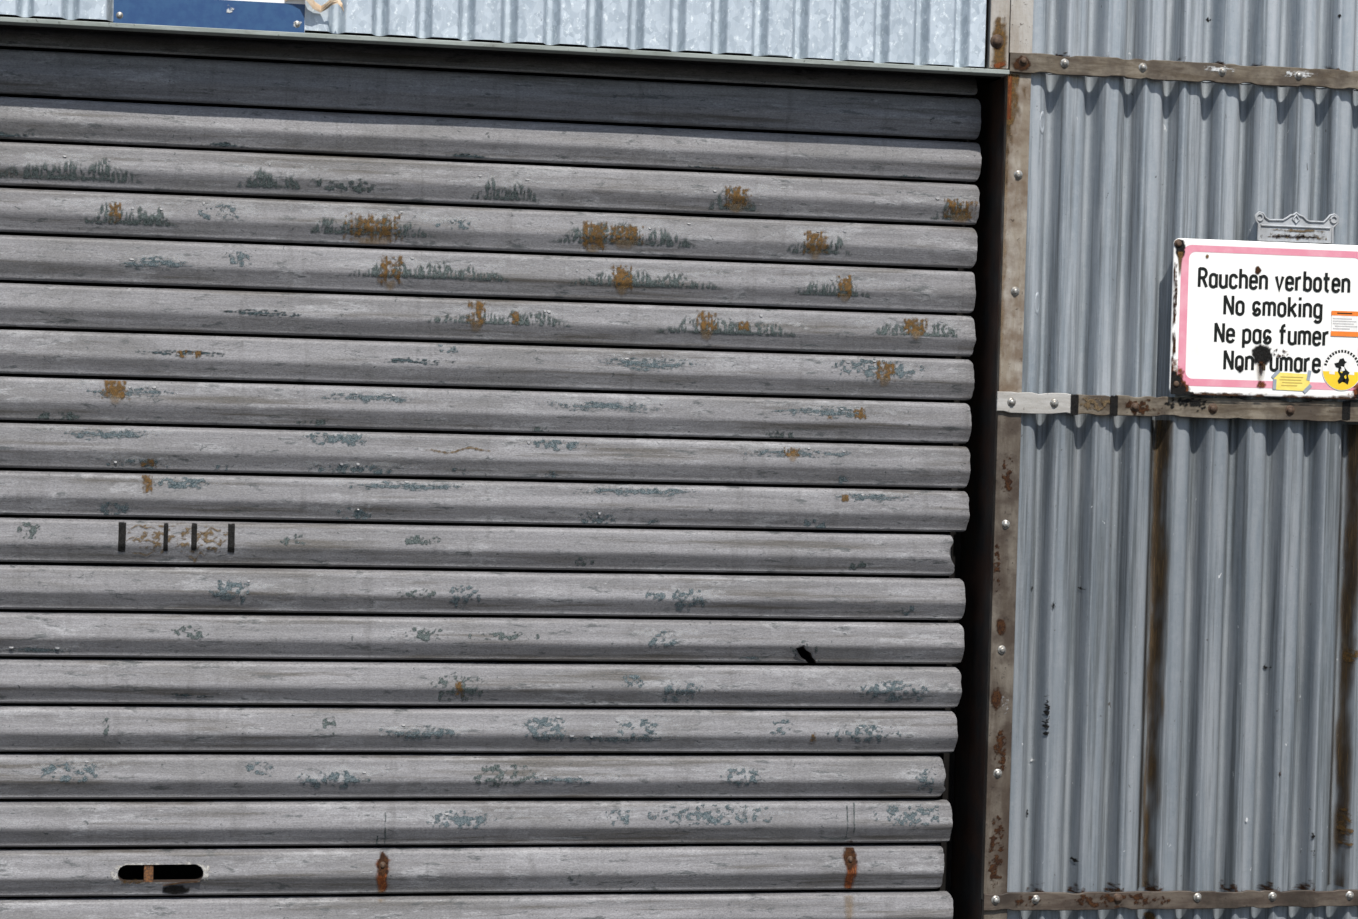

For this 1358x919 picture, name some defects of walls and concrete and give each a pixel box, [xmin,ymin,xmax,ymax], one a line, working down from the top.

rust [844,803,857,889]